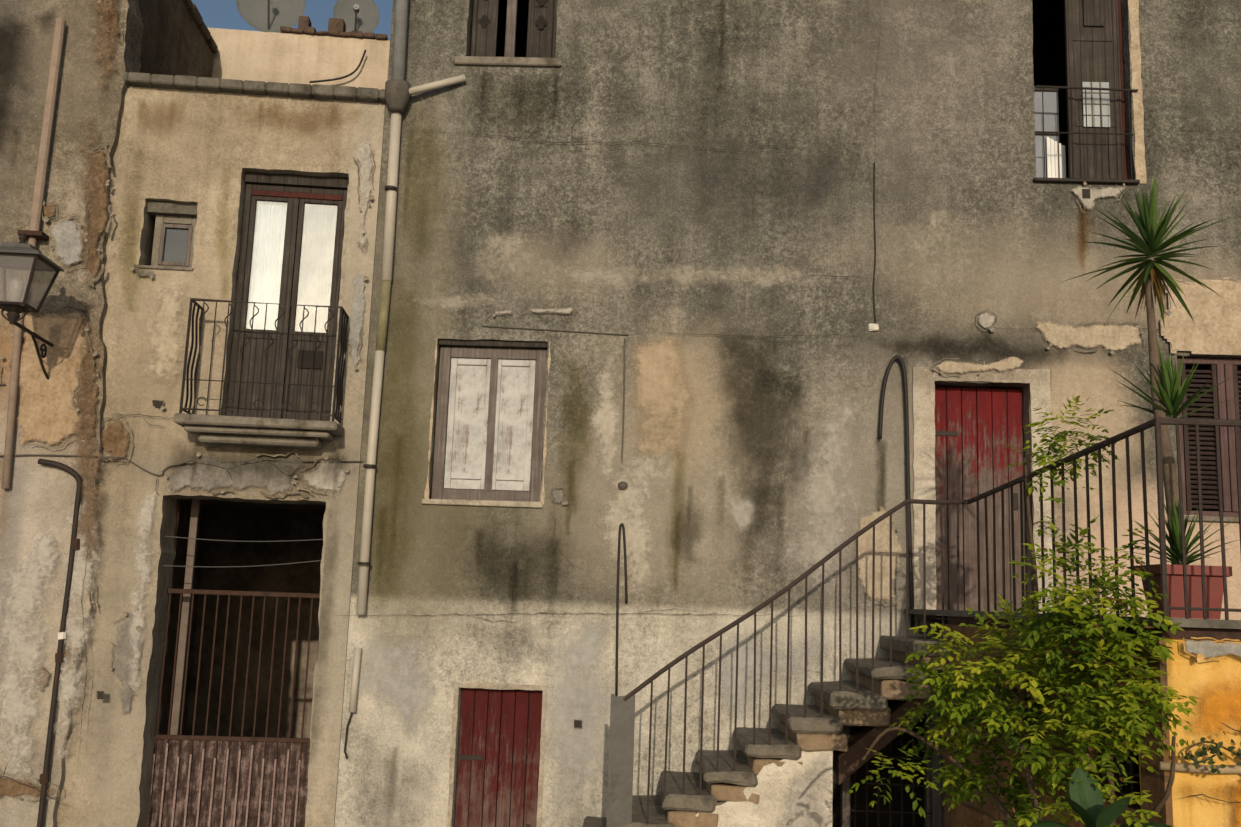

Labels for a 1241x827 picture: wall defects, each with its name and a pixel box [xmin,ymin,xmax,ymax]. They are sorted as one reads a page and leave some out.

spalling [42,115,113,287]
peeling [1037,321,1145,354]
peeling [1160,277,1241,355]
peeling [0,301,102,559]
peeling [165,451,349,498]
leakage [730,500,753,528]
peeling [855,506,902,606]
peeling [1183,637,1241,663]